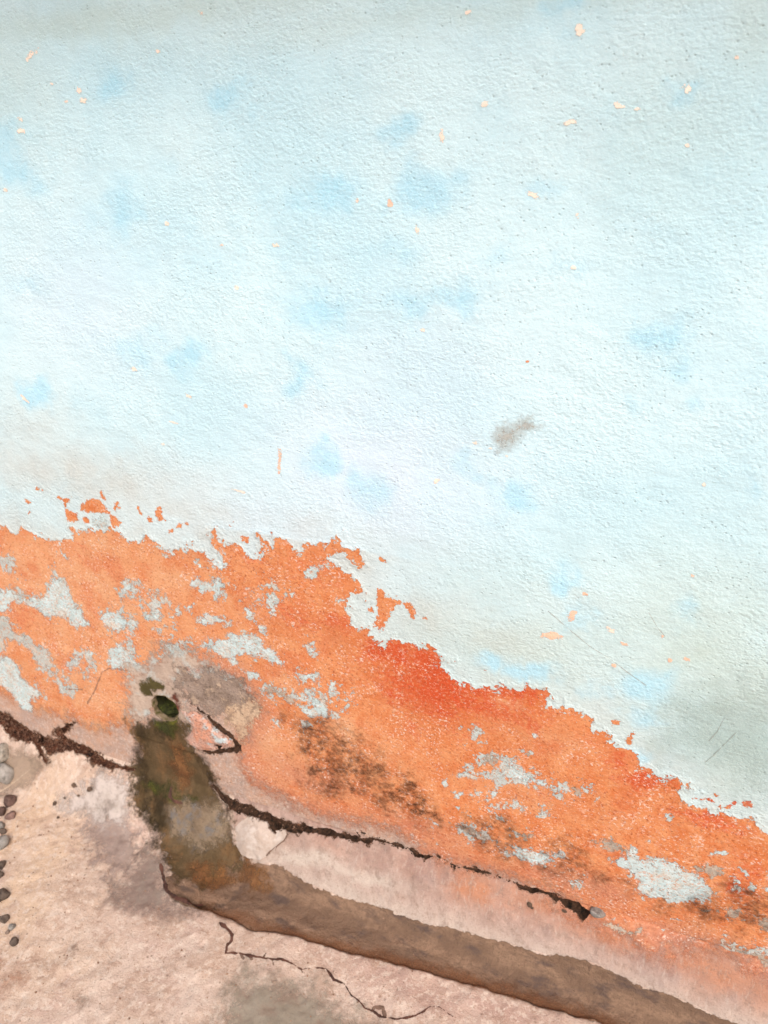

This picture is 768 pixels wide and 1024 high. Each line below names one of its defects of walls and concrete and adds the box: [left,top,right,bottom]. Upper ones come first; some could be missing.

crack [0,668,136,792]
crack [190,703,242,755]
leakage [299,718,425,811]
peeling [0,491,768,979]
crack [159,863,456,1020]
leakage [59,766,737,1024]
crack [211,784,590,922]